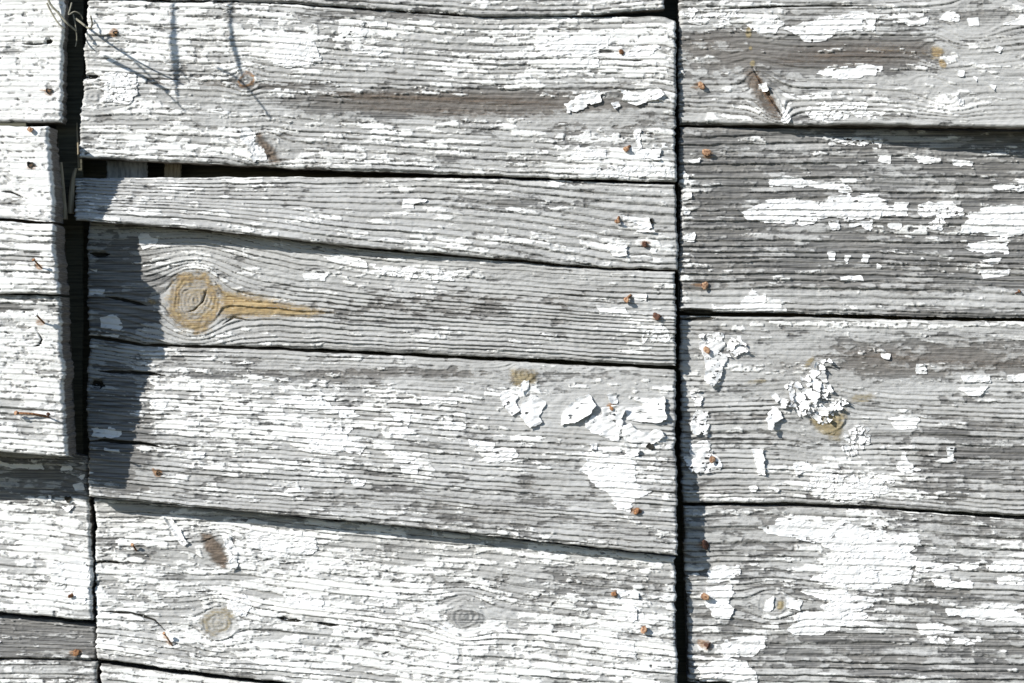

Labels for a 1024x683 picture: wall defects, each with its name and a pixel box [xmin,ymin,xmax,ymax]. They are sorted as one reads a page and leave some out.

peeling [564,87,664,113]
peeling [741,176,1024,282]
peeling [499,380,546,428]
peeling [683,332,748,474]
peeling [766,358,849,430]
peeling [841,424,871,456]
peeling [748,448,780,492]